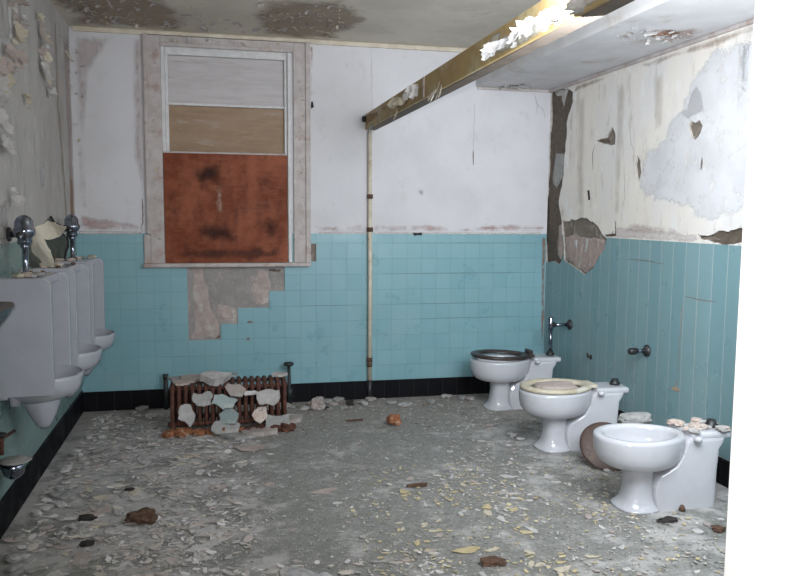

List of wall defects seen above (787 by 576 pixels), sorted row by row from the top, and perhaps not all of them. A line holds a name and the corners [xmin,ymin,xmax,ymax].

water stain [58,0,176,28]
water stain [259,4,360,38]
peeling [0,0,58,155]
spalling [599,129,616,145]
peeling [637,43,752,221]
spalling [547,89,607,274]
spalling [701,228,743,245]
peeling [187,267,285,340]